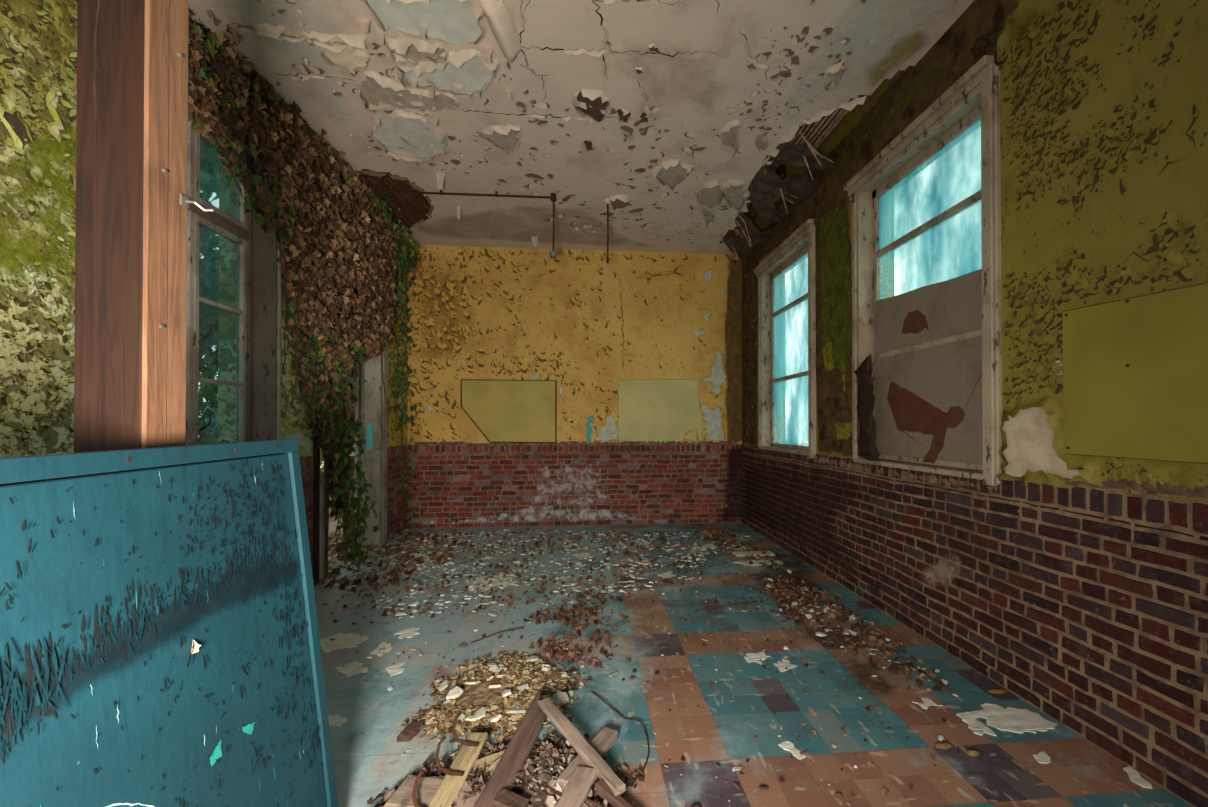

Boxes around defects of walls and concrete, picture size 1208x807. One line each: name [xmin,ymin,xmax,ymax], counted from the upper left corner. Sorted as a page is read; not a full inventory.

crack [277,34,355,81]
crack [447,0,769,126]
peeling [999,0,1173,214]
peeling [1116,3,1187,67]
peeling [0,0,77,441]
peeling [236,0,853,446]
flaking render [998,210,1208,499]
leakage [424,462,635,525]